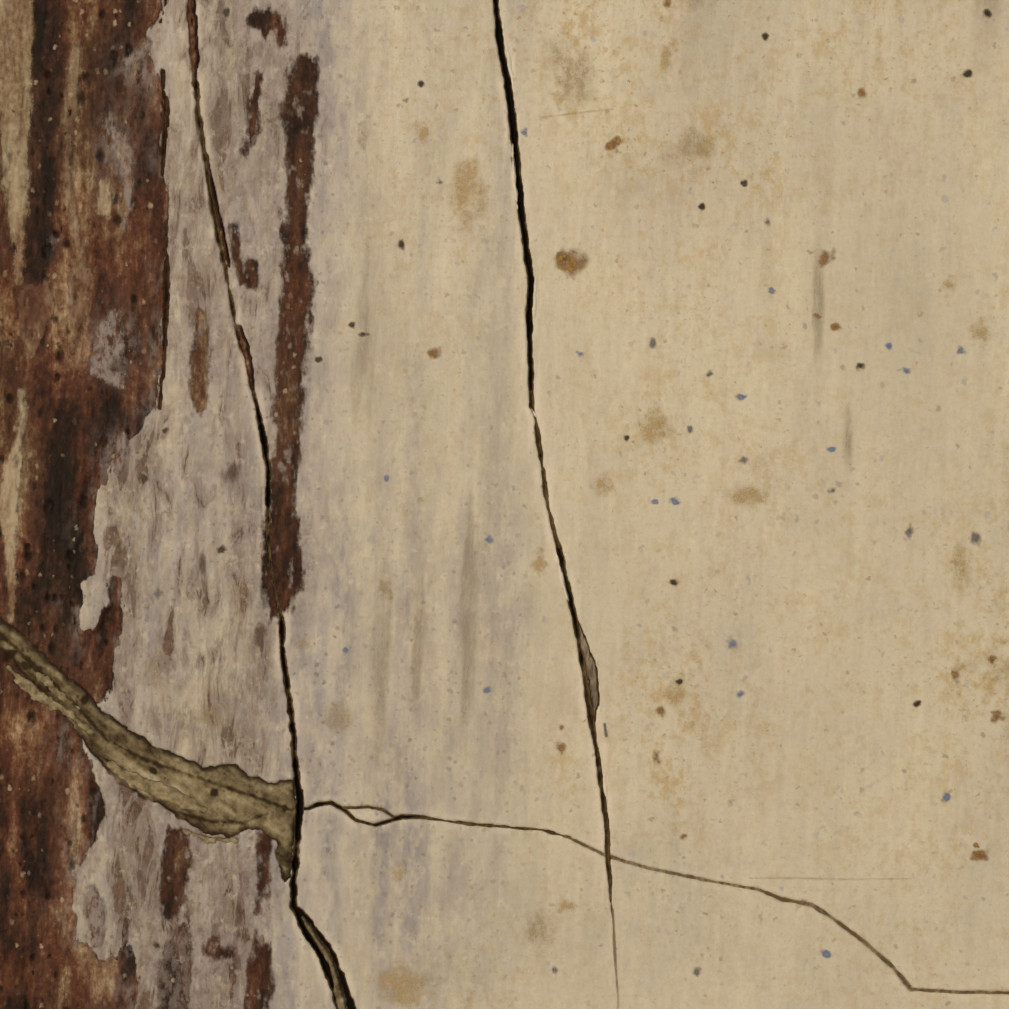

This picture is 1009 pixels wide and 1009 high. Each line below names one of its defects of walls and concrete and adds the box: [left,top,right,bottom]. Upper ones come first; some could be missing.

peeling [246,7,287,46]
peeling [240,71,263,156]
peeling [228,224,258,289]
peeling [0,0,170,704]
peeling [188,308,210,413]
peeling [261,53,320,620]
crack [186,0,616,1009]
peeling [0,649,141,1009]
peeling [156,825,238,1009]
peeling [244,931,275,1009]
peeling [253,832,272,915]
crack [610,855,1009,995]